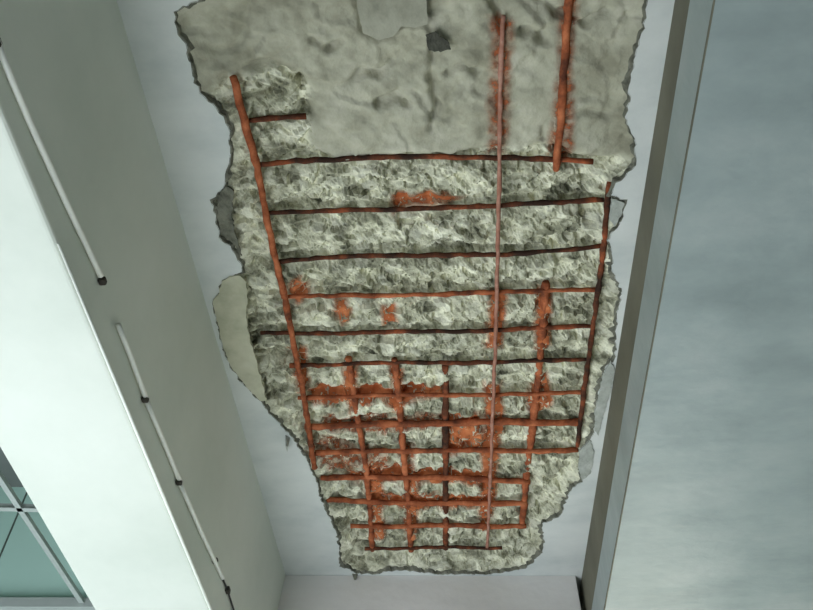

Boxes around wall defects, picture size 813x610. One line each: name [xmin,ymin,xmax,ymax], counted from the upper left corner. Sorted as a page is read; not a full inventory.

corrosion [490,16,512,150]
corrosion [550,0,576,156]
corrosion [393,191,453,207]
corrosion [334,299,350,322]
corrosion [382,304,396,325]
spalling [174,0,648,580]
corrosion [486,294,506,348]
corrosion [290,347,504,541]